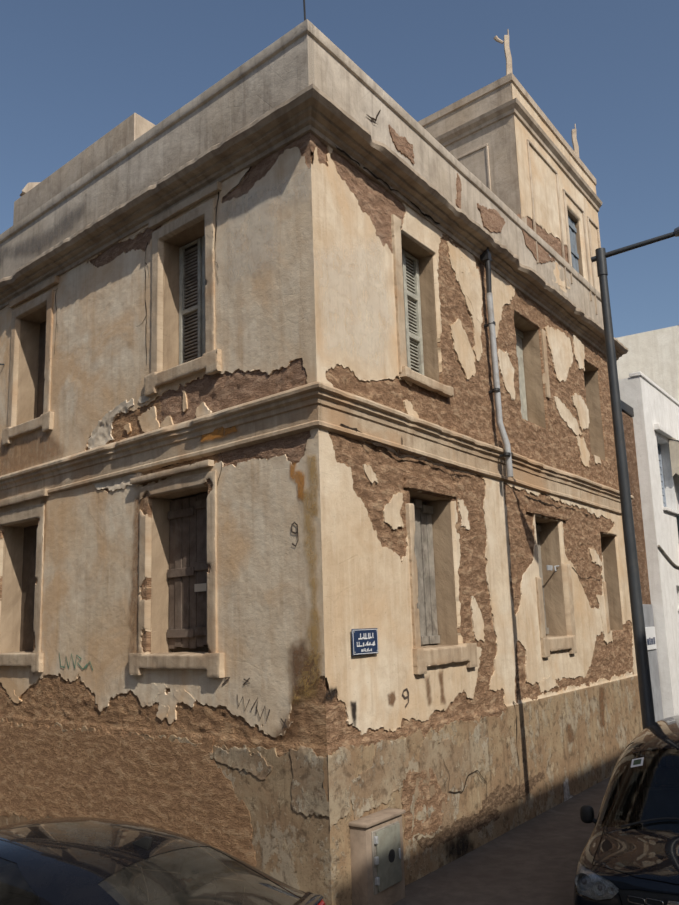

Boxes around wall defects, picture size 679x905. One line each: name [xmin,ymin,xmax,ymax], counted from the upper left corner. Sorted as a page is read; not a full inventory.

peeling [388,124,415,164]
crack [136,242,149,327]
spalling [222,132,405,253]
peeling [477,203,505,233]
spalling [517,213,570,289]
spalling [86,358,308,450]
spalling [325,234,619,491]
corrosion [290,463,304,500]
spalling [504,483,634,704]
spalling [0,430,545,867]